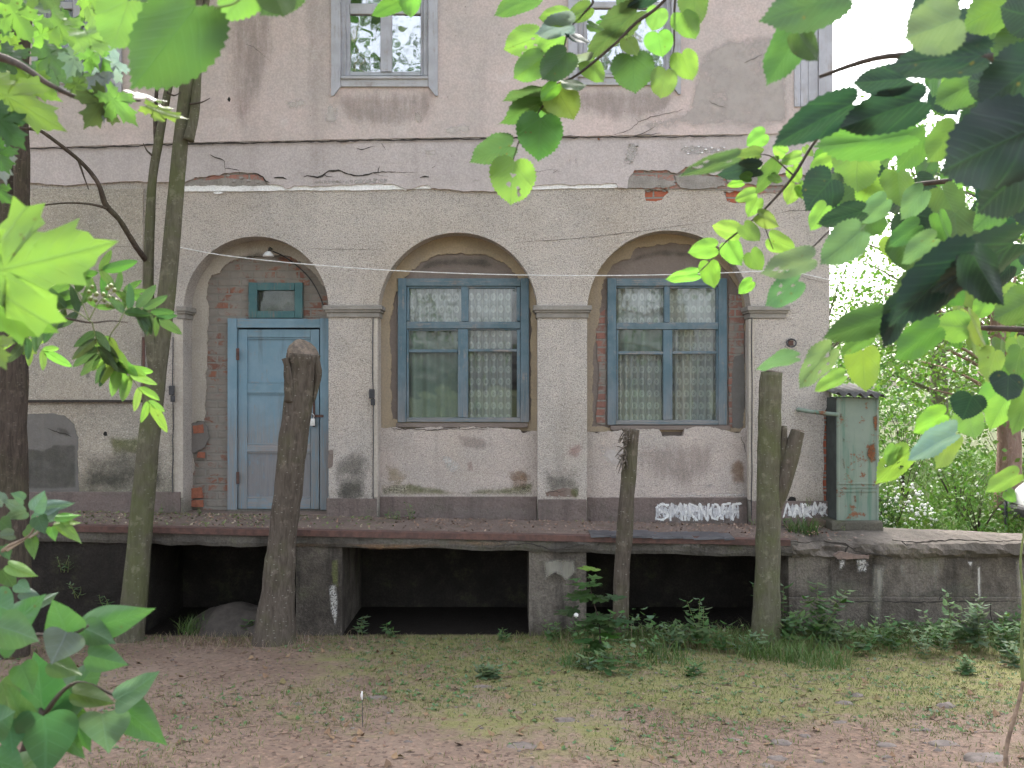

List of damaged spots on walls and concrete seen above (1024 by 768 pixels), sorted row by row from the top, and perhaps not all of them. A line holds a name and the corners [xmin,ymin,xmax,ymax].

crack [562,110,729,139]
crack [30,137,487,183]
flaking render [184,172,431,194]
flaking render [532,144,806,203]
flaking render [596,307,607,425]
flaking render [192,421,210,458]
rust [867,443,876,462]